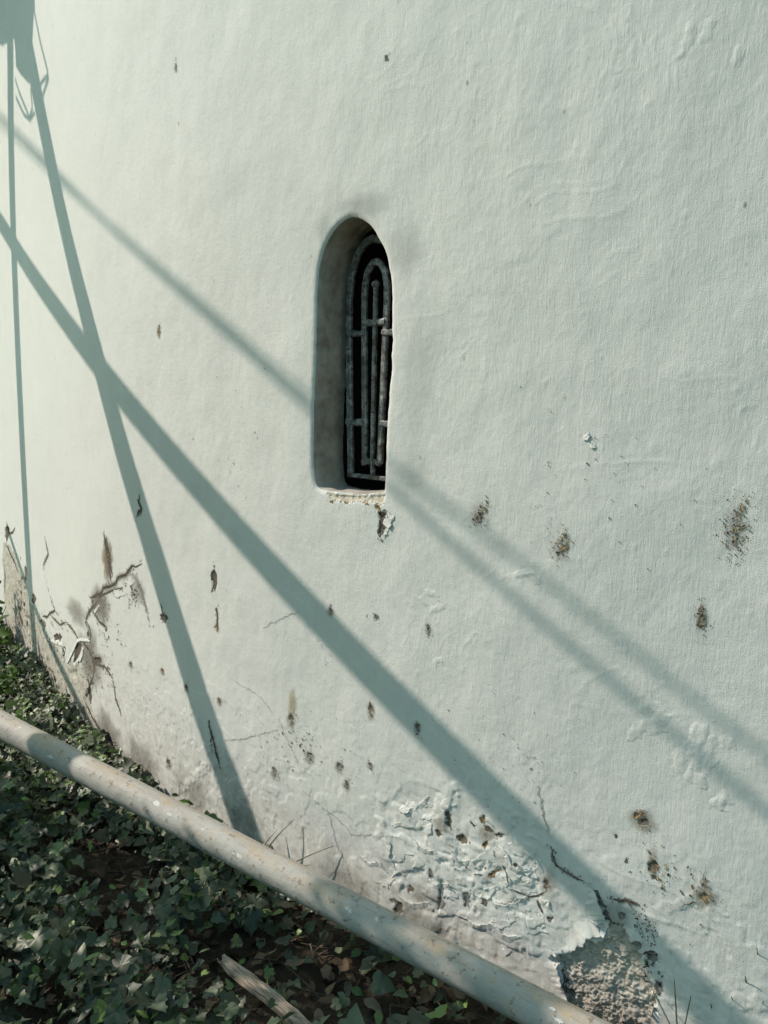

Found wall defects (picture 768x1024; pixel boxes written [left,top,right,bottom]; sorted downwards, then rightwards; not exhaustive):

flaking render [2,526,102,729]
crack [42,533,151,747]
peeling [327,492,395,551]
spalling [360,795,663,1024]